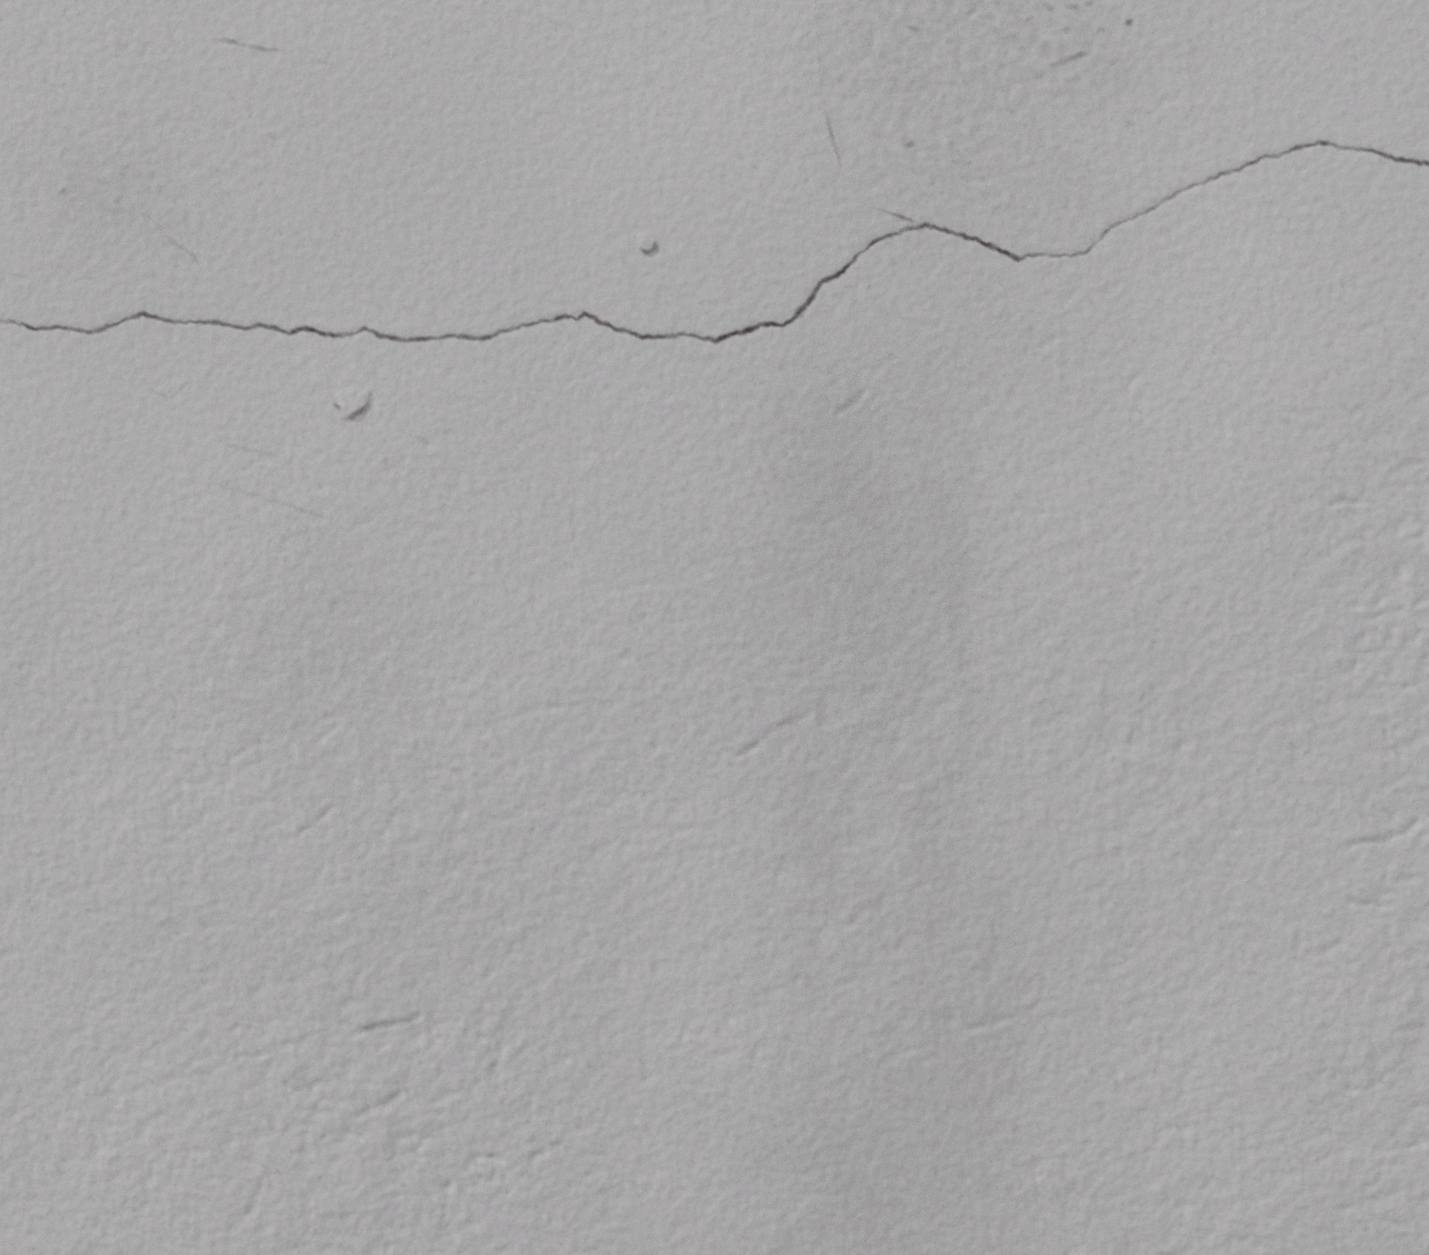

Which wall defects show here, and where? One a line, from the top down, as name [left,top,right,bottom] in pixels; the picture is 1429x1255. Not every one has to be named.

crack [1377,152,1429,164]
crack [702,223,1019,342]
crack [100,313,490,340]
crack [527,312,665,339]